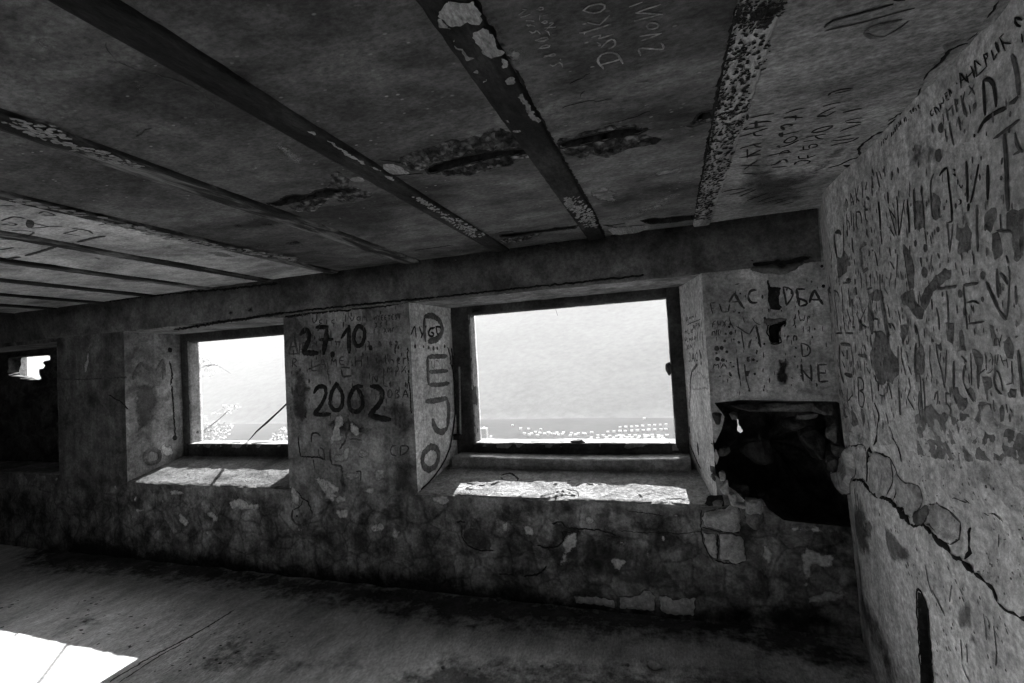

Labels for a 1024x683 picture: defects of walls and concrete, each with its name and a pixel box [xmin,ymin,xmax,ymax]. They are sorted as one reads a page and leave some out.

peeling [438,1,541,123]
peeling [1,118,145,168]
spalling [266,120,529,212]
spalling [556,124,662,160]
peeling [412,197,485,238]
spalling [499,187,695,244]
spalling [705,322,1024,536]
flaking render [802,547,845,602]
crack [852,437,1024,621]
flaking render [886,525,1008,682]